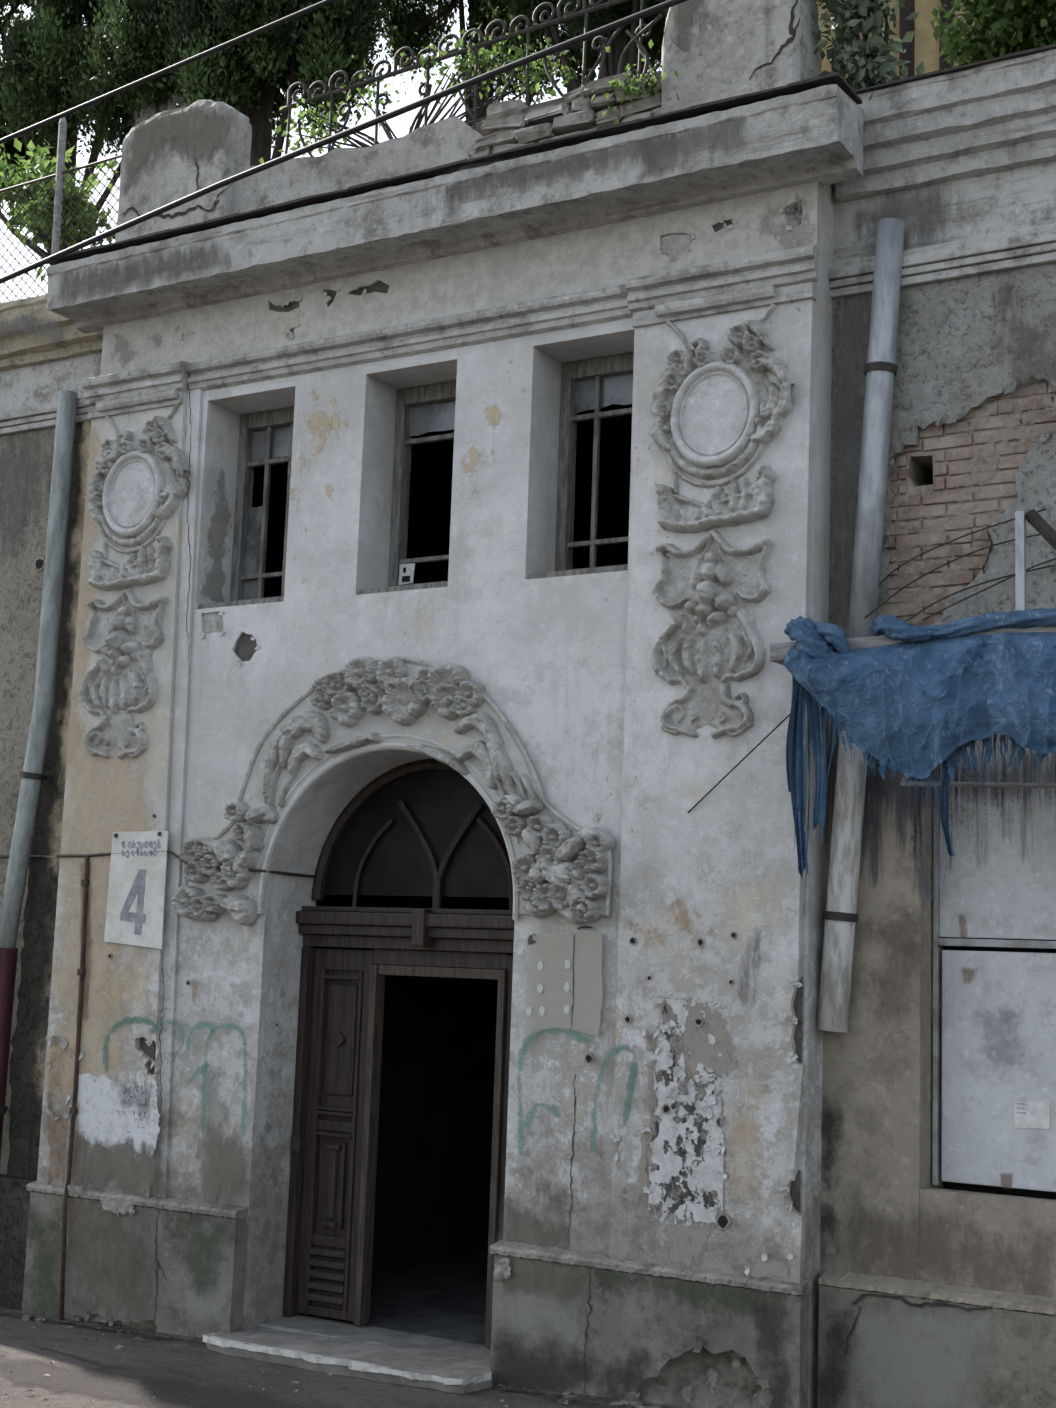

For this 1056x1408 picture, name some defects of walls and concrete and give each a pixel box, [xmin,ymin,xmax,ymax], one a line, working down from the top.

crack [749,0,800,80]
crack [123,158,232,219]
damp [80,428,95,556]
peeling [199,469,259,666]
spalling [879,377,1056,626]
damp [43,578,146,1095]
damp [826,723,839,841]
damp [863,753,939,899]
peeling [637,994,738,1226]
crack [568,1074,592,1394]
spalling [622,1337,772,1408]
crack [842,1293,992,1360]